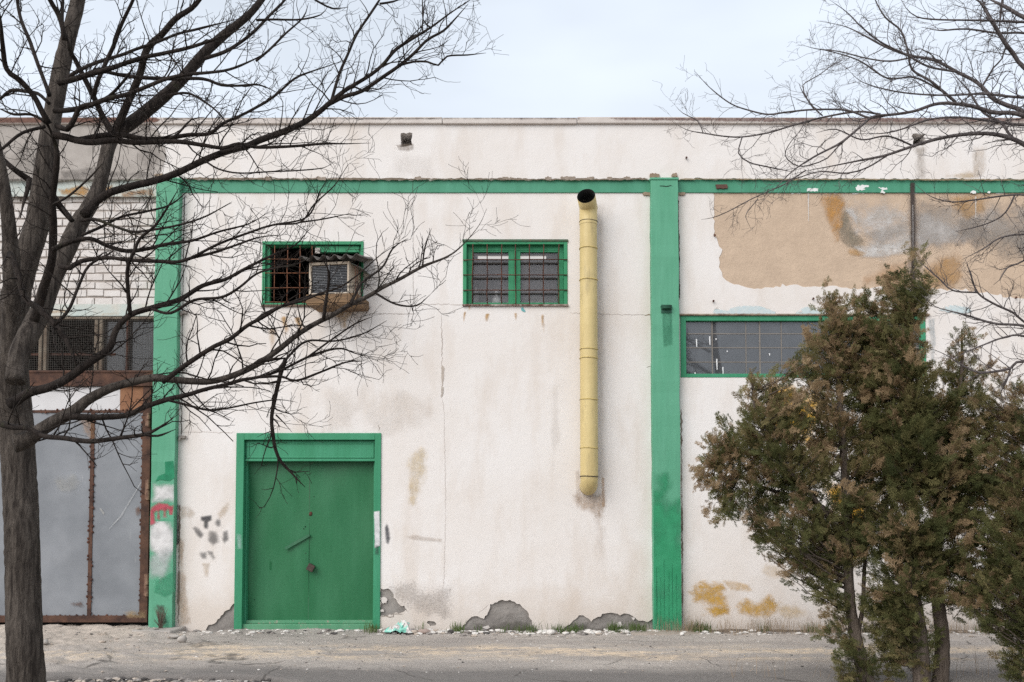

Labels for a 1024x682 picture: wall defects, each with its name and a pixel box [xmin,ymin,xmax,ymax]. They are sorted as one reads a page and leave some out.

peeling [186,173,1024,299]
crack [371,303,462,585]
spalling [206,604,234,632]
spalling [380,589,406,616]
spalling [462,600,535,631]
spalling [565,613,652,630]